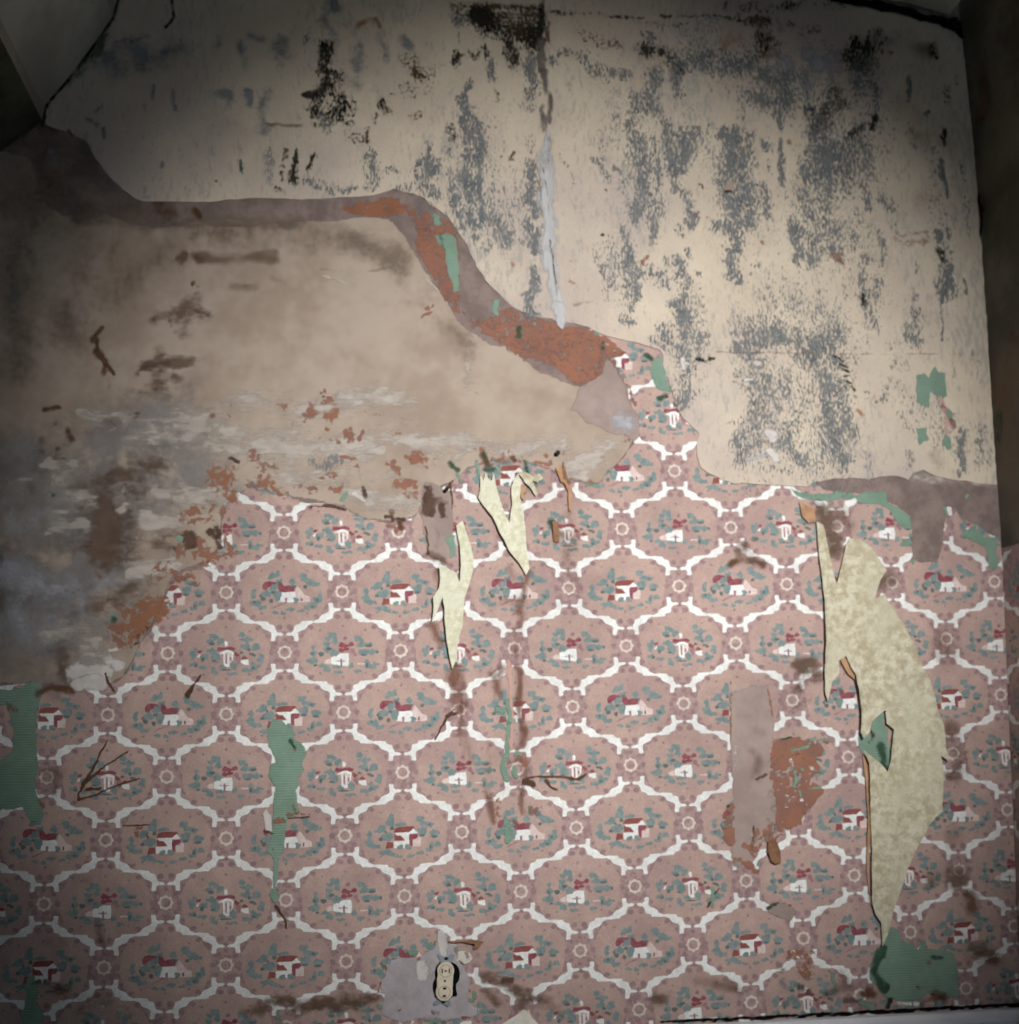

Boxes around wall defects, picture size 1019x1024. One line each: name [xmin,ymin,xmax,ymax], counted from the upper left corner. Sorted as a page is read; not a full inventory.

leakage [176,251,223,262]
flaking render [2,123,632,407]
leakage [265,33,543,338]
crack [534,0,566,329]
leakage [450,1,995,557]
leakage [0,354,238,696]
leakage [228,388,552,511]
peeling [0,681,65,823]
peeling [263,719,306,903]
peeling [750,737,829,853]
peeling [858,710,894,769]
peeling [858,927,959,1010]